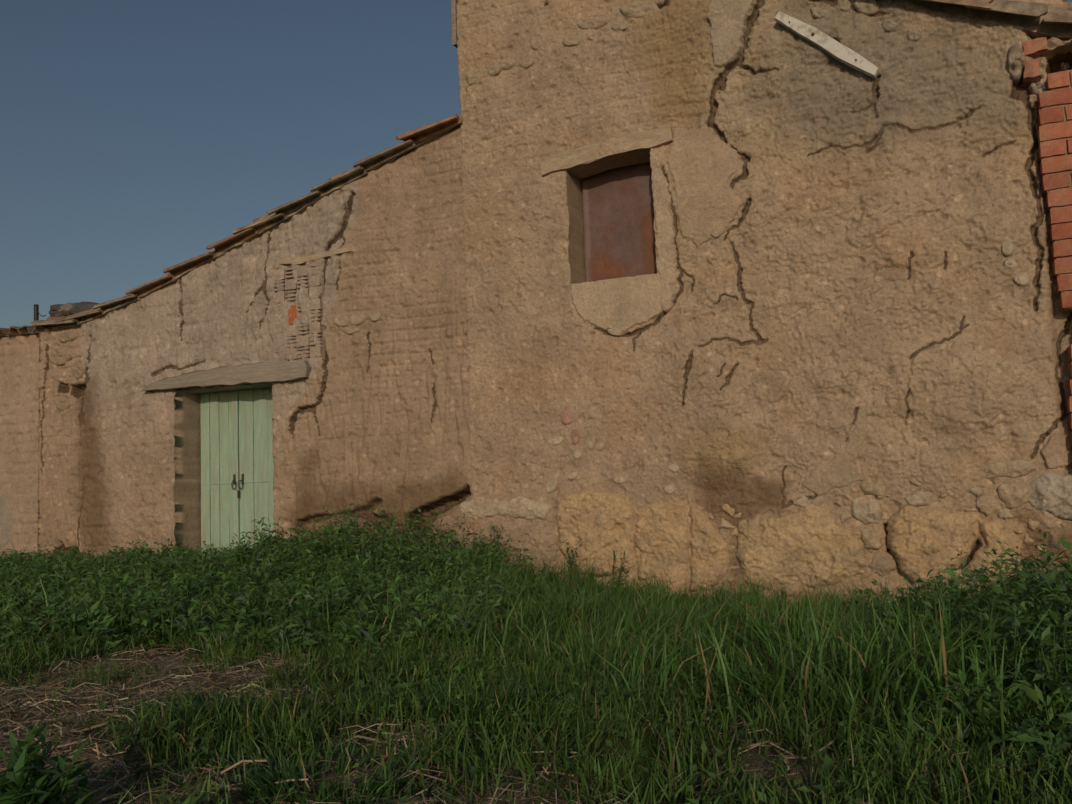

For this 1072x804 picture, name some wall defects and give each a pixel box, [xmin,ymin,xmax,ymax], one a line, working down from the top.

crack [288,192,356,439]
rust [644,216,656,272]
crack [594,0,780,407]
crack [807,74,981,157]
crack [982,97,1044,312]
crack [1030,312,1072,459]